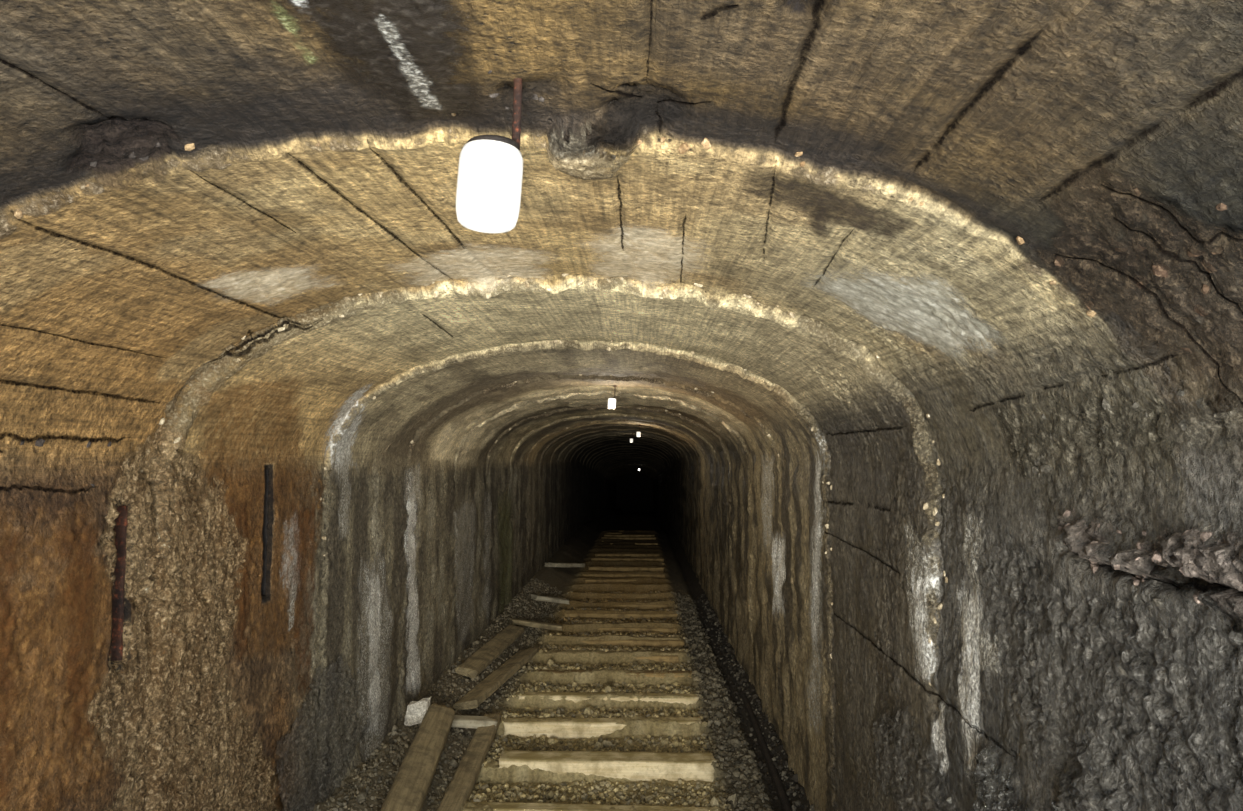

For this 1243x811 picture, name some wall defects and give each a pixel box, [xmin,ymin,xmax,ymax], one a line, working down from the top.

spalling [535,83,711,169]
spalling [0,116,248,237]
spalling [792,152,837,187]
crack [0,380,159,403]
crack [0,433,130,453]
crack [0,484,96,495]
spalling [977,507,1243,811]